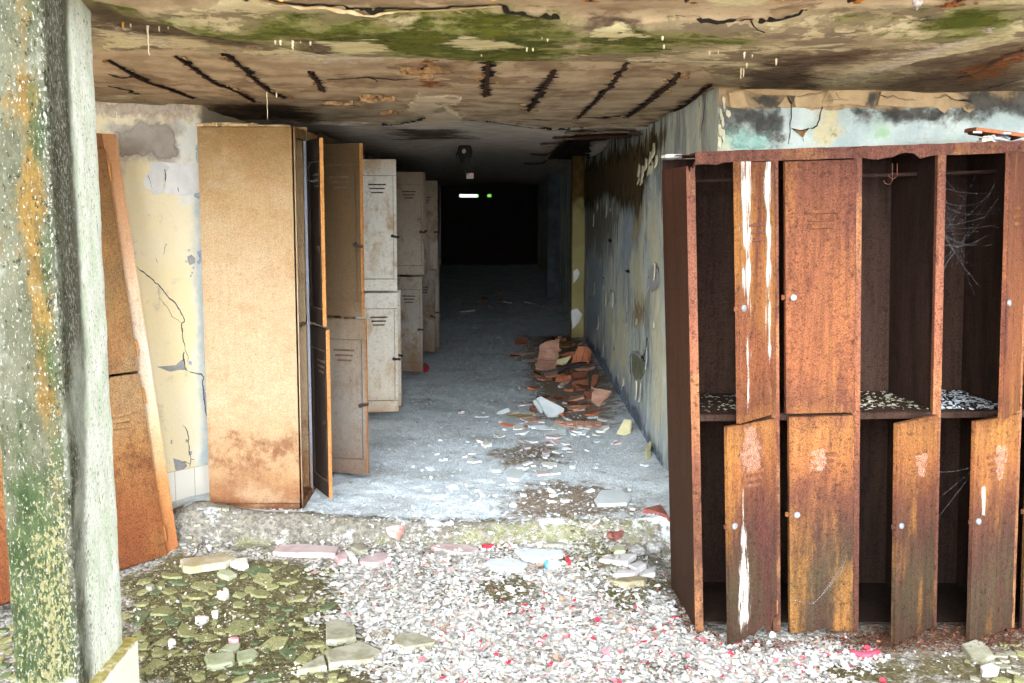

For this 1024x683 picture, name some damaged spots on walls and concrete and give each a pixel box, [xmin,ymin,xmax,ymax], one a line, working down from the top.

spalling [102,60,198,100]
spalling [172,53,293,103]